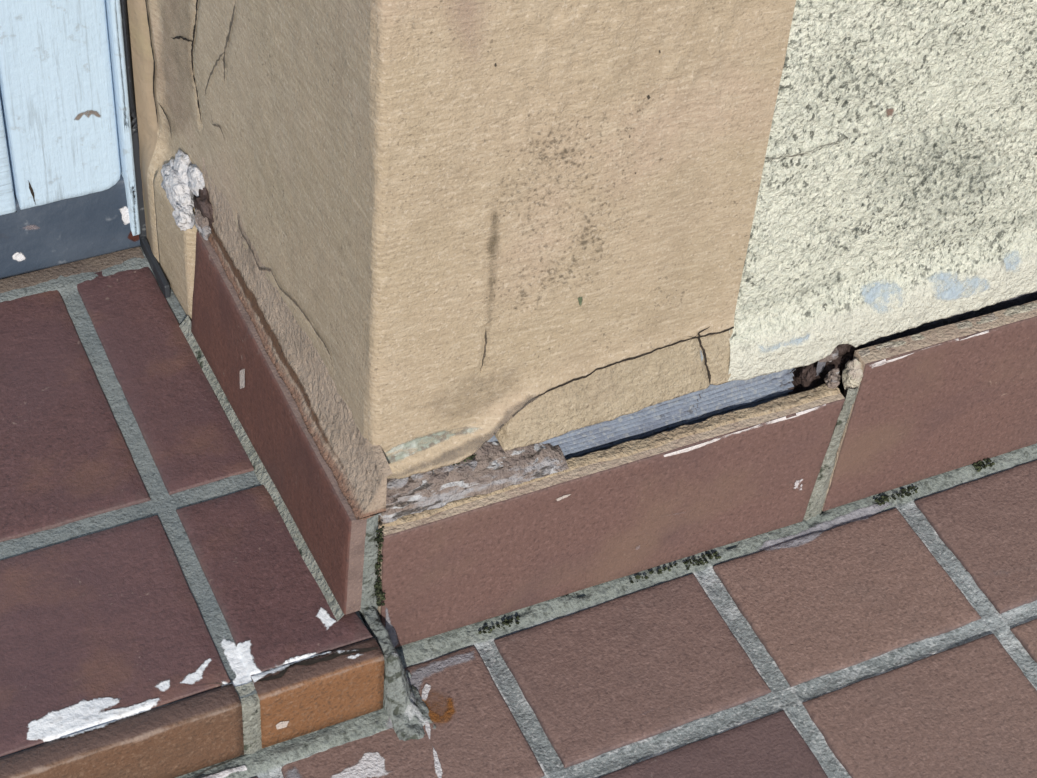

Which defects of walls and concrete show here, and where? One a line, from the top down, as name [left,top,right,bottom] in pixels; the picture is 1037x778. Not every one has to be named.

crack [145,0,235,140]
crack [500,327,734,429]
spalling [378,291,1037,524]